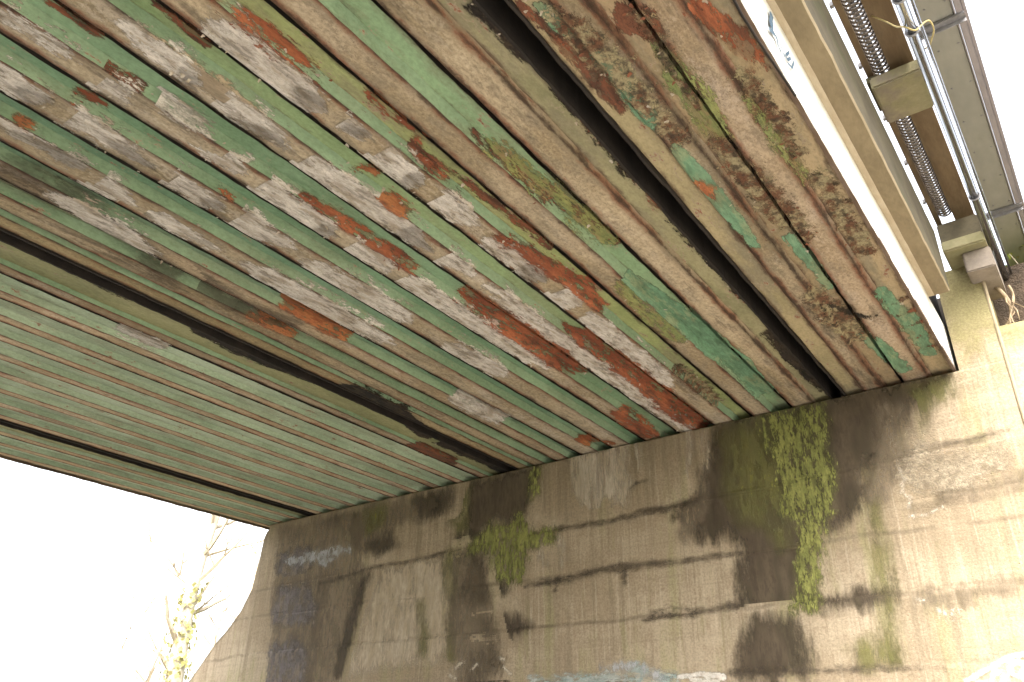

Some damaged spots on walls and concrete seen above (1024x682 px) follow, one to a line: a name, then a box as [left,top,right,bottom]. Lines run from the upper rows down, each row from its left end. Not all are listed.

peeling [0,0,698,432]
water stain [272,508,371,682]
water stain [336,382,538,682]
water stain [672,330,948,682]